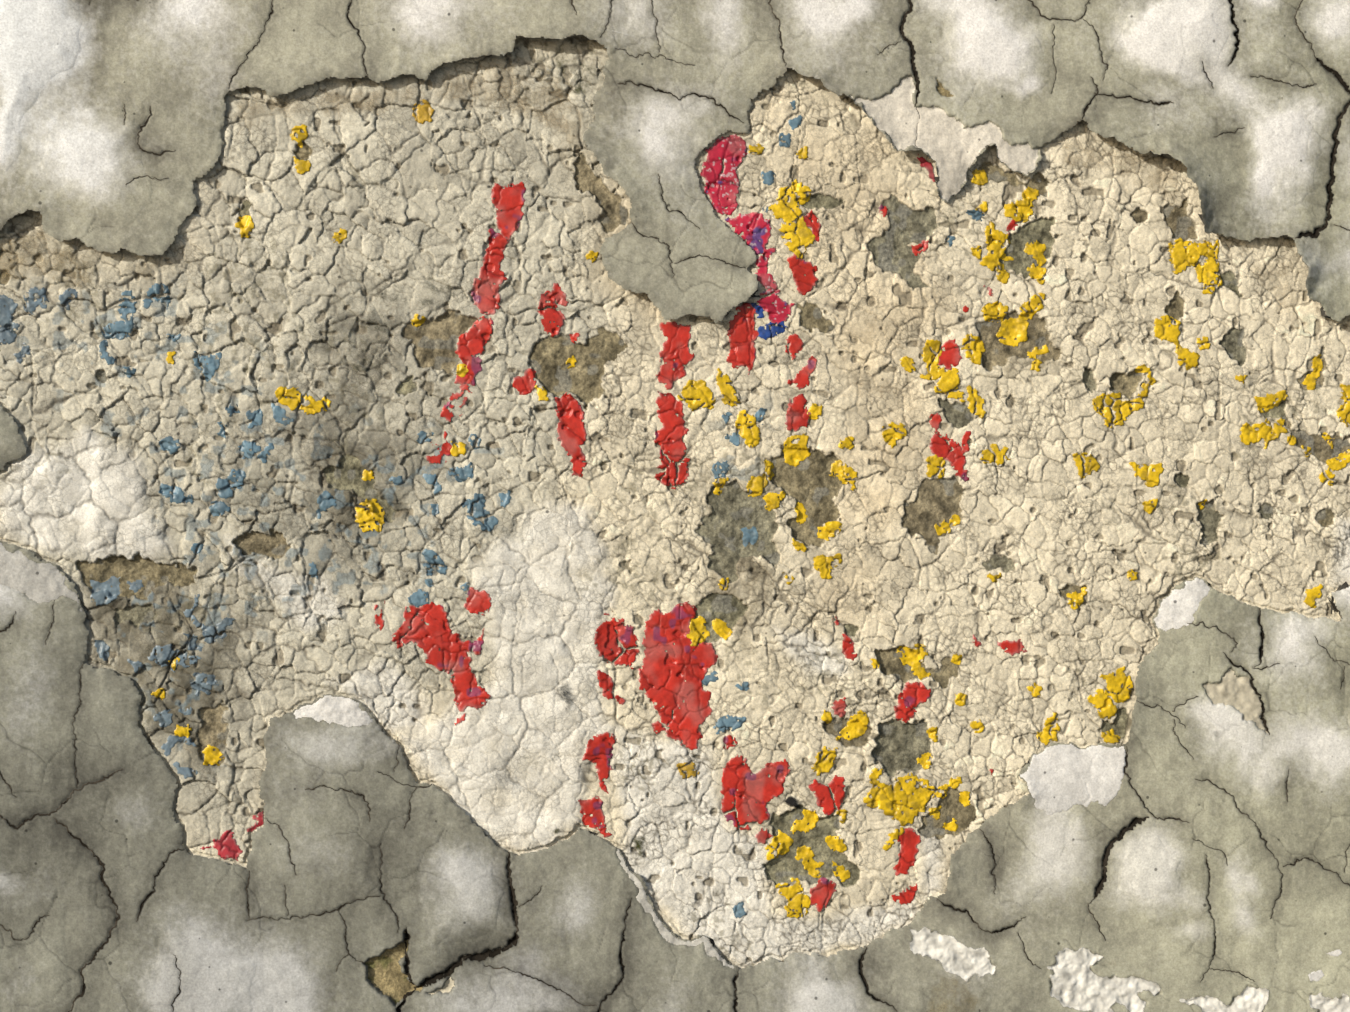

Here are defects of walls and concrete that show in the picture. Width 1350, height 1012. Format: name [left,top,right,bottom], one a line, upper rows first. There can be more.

crack [877,0,922,151]
crack [1202,0,1350,238]
peeling [996,317,1029,347]
peeling [686,616,710,646]
crack [1187,608,1280,735]
crack [0,663,184,1012]
crack [245,737,632,1012]
peeling [795,845,824,878]
crack [1088,746,1255,982]
peeling [910,927,996,982]
peeling [1047,947,1161,1012]
peeling [1179,986,1269,1012]